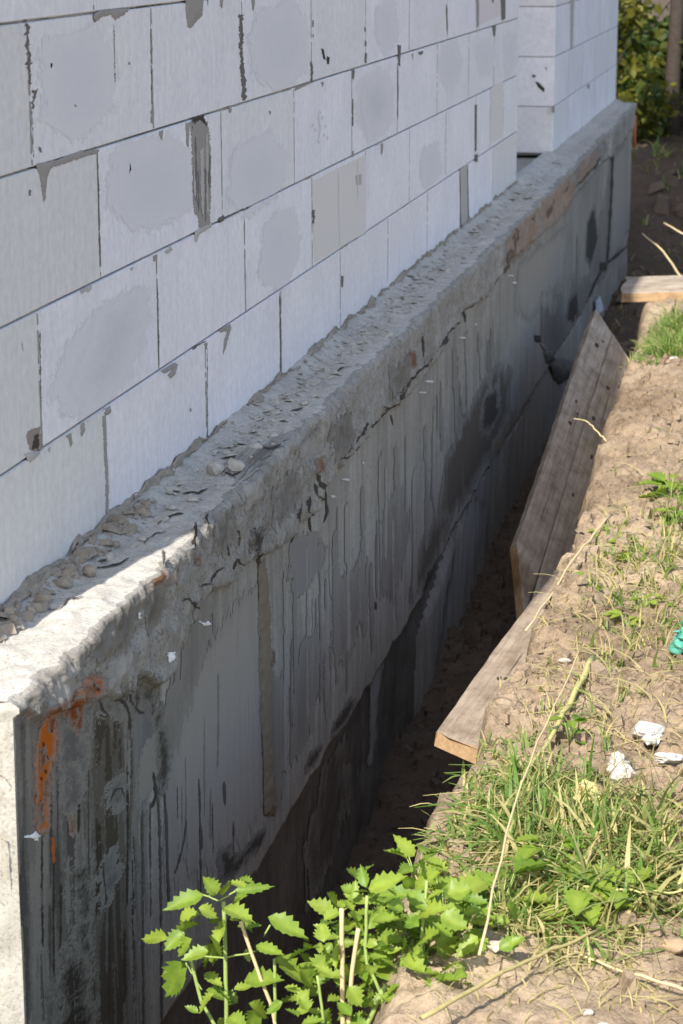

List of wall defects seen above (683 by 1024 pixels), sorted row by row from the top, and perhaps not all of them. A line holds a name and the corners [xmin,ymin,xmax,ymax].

leakage [515,140,627,354]
leakage [46,285,155,425]
crack [342,279,498,459]
crack [97,471,329,609]
leakage [16,319,502,1024]
corrosion [22,671,108,864]
crack [259,730,267,815]